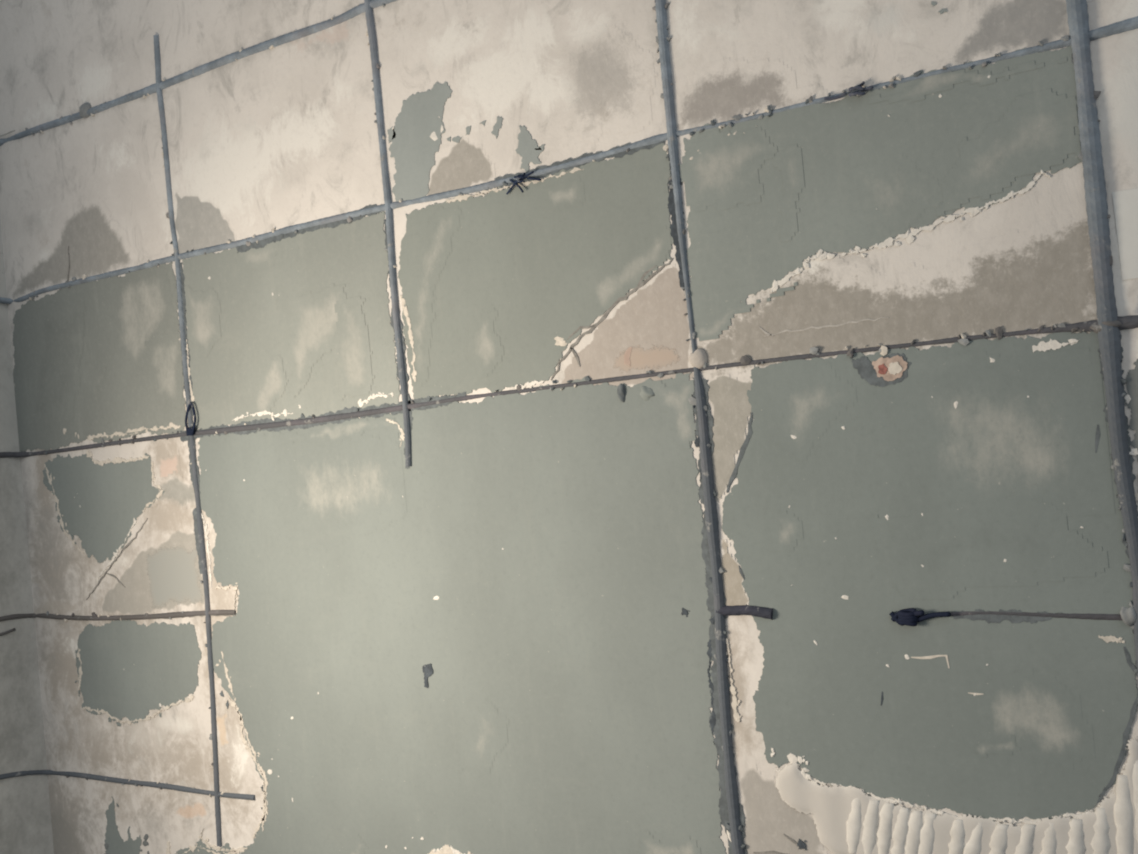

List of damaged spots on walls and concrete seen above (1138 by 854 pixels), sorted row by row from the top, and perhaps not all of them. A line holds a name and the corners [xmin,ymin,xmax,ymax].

peeling [679,45,1082,341]
peeling [13,82,726,854]
peeling [722,332,1138,821]